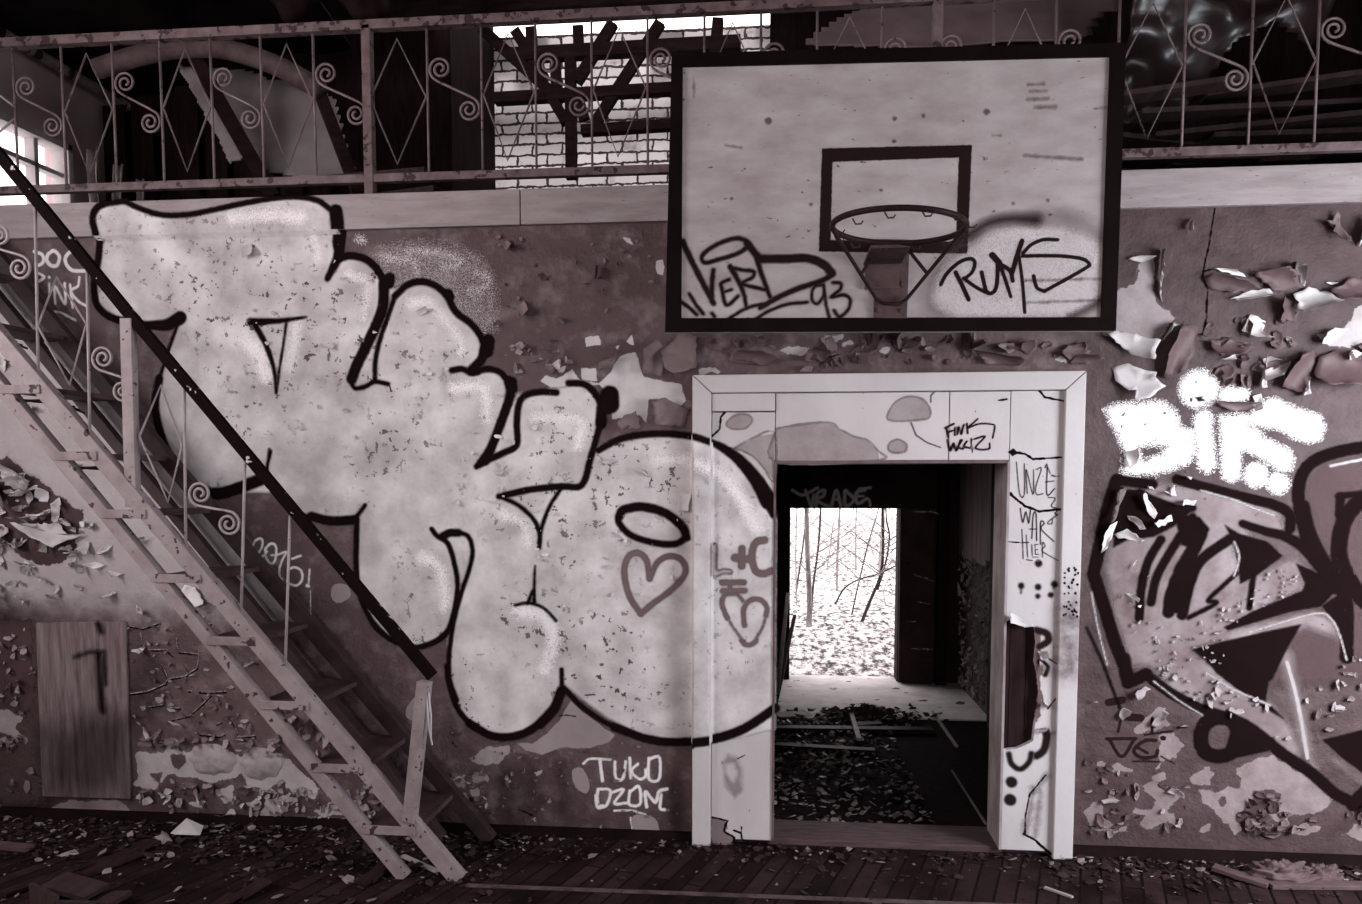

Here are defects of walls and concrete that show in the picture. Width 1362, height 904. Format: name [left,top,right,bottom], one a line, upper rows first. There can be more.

spalling [1326,210,1362,246]
peeling [504,237,1362,432]
peeling [1125,448,1140,469]
peeling [1101,473,1197,553]
peeling [0,456,123,753]
peeling [182,585,206,618]
peeling [1120,569,1298,718]
peeling [1305,656,1362,732]
spalling [52,734,346,823]
peeling [284,710,330,759]
spalling [1083,686,1334,839]
spalling [1341,808,1362,841]